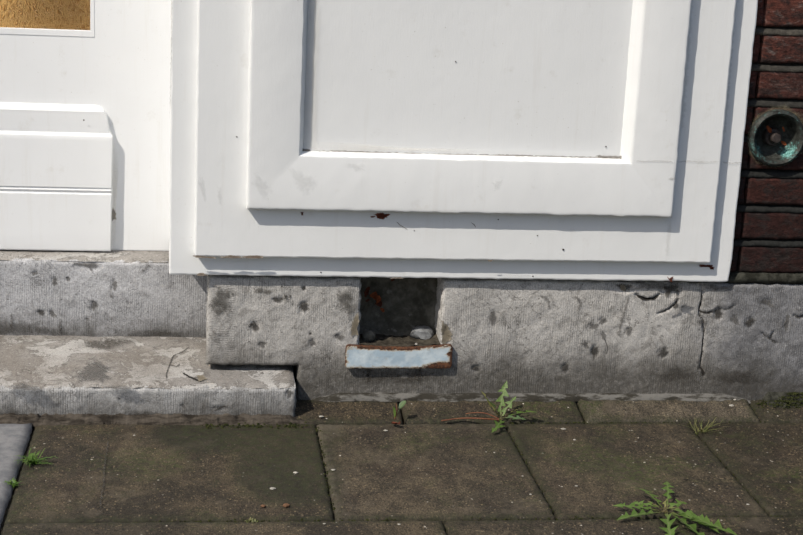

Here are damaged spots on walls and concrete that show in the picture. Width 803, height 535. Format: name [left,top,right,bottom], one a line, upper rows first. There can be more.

crack [636,294,678,313]
crack [698,295,733,375]